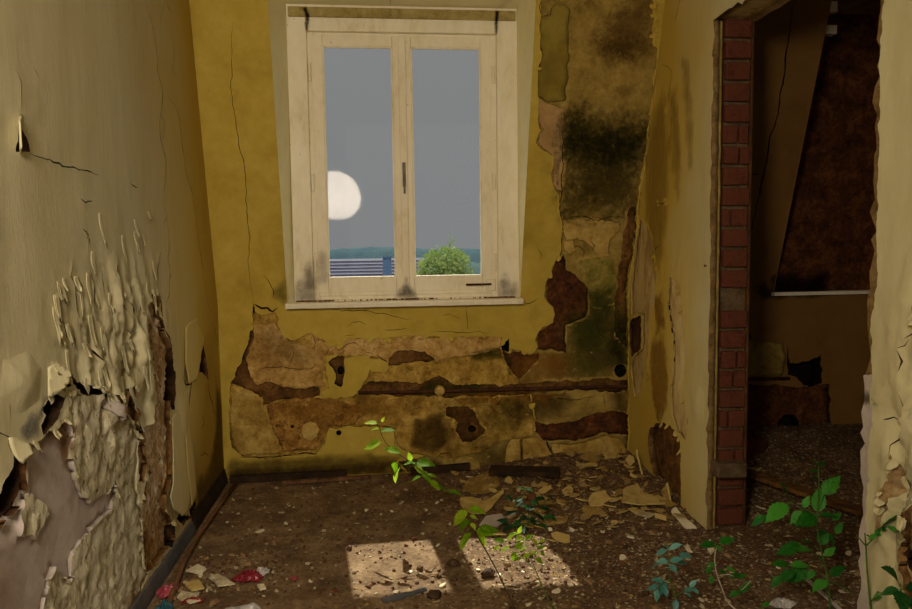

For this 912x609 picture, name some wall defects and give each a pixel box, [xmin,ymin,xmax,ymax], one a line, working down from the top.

peeling [16,114,30,154]
peeling [0,251,196,609]
crack [230,28,277,314]
flaking render [229,0,697,533]
mould [562,111,646,220]
damp [651,342,667,420]
crack [751,2,794,231]
flaking render [747,347,832,430]
flaking render [855,62,912,609]